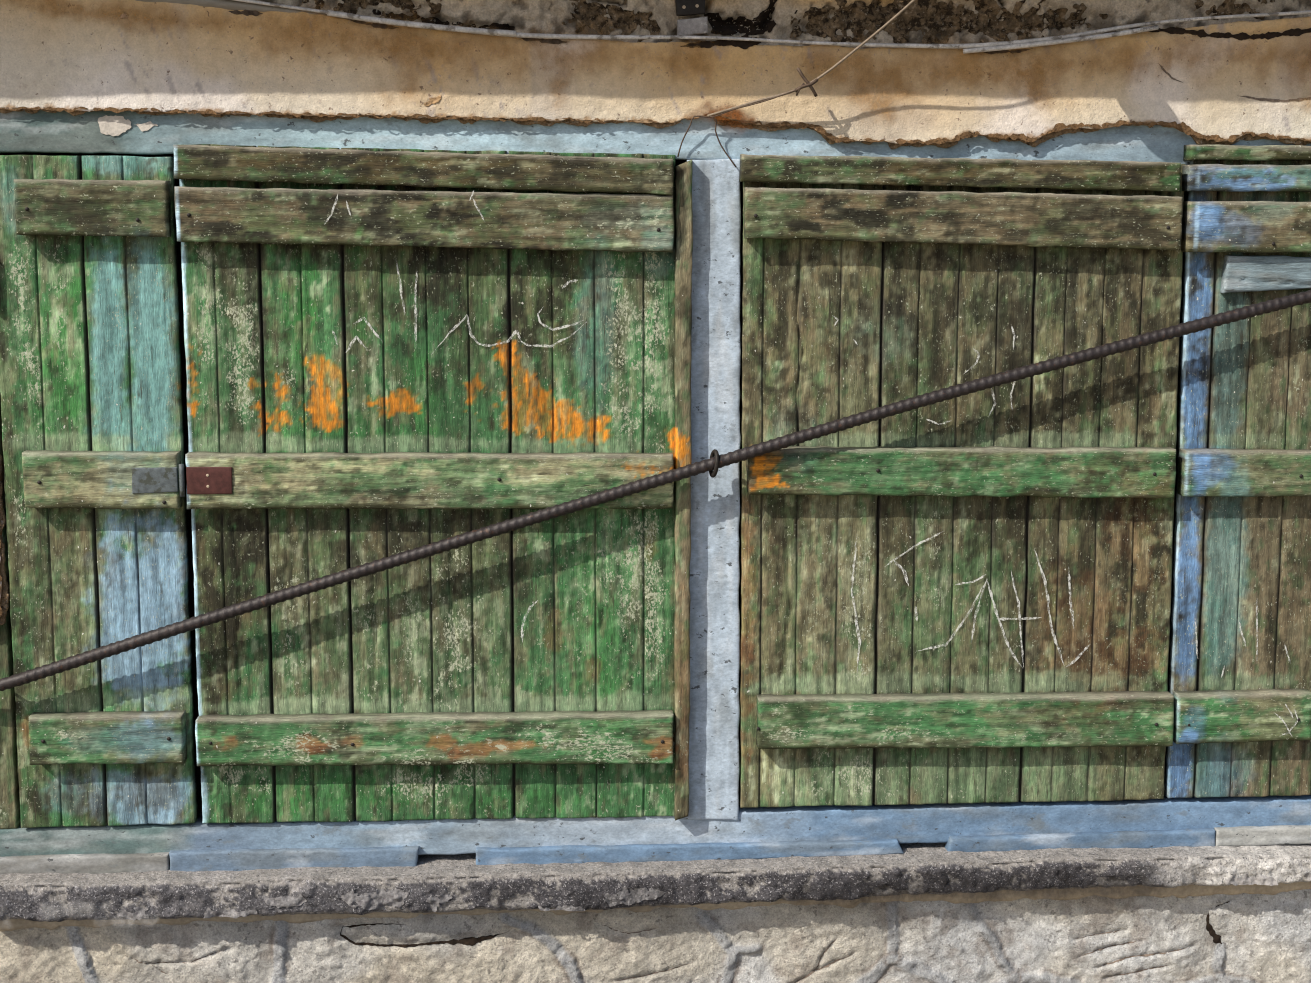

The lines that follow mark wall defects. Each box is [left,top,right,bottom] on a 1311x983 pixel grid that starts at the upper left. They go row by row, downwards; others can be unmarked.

spalling [0,95,680,136]